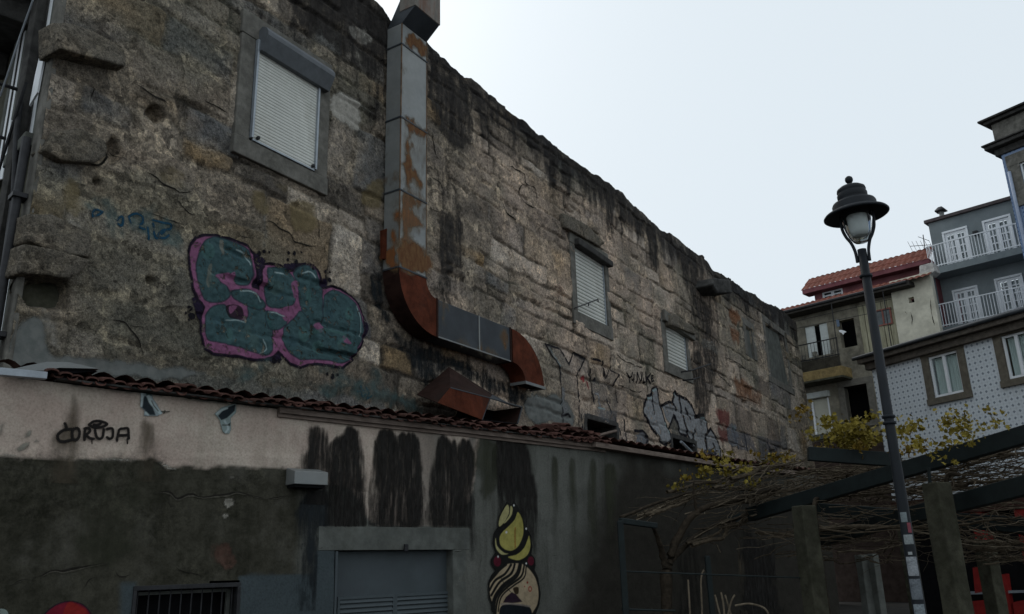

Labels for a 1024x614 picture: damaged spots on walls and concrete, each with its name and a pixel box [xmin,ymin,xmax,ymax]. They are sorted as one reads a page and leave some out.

corrosion [406,33,427,57]
water stain [428,74,482,152]
corrosion [379,117,433,275]
water stain [437,175,463,305]
water stain [297,426,538,603]